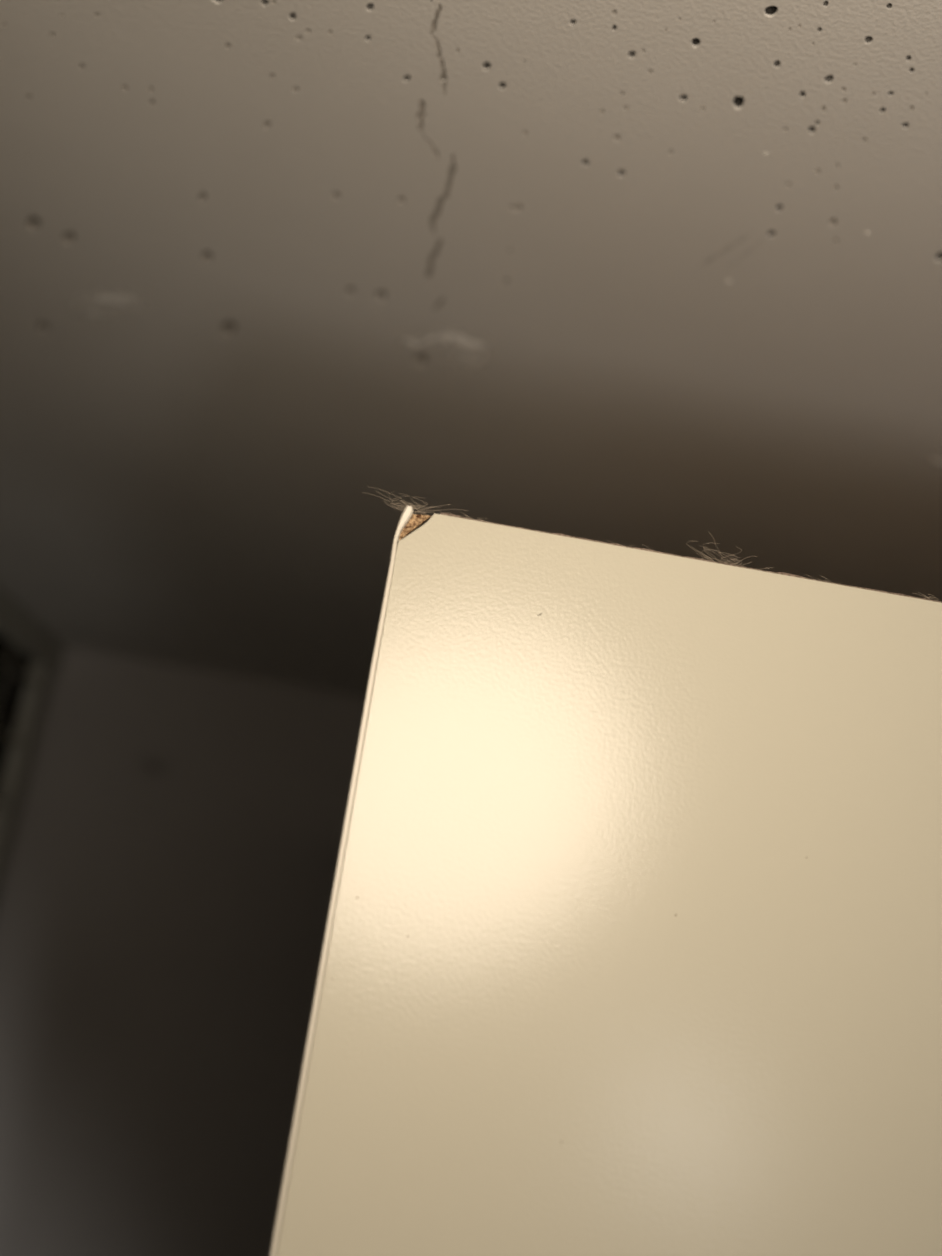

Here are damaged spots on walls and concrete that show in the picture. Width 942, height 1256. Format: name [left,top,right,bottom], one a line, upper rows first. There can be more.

crack [416,0,457,309]